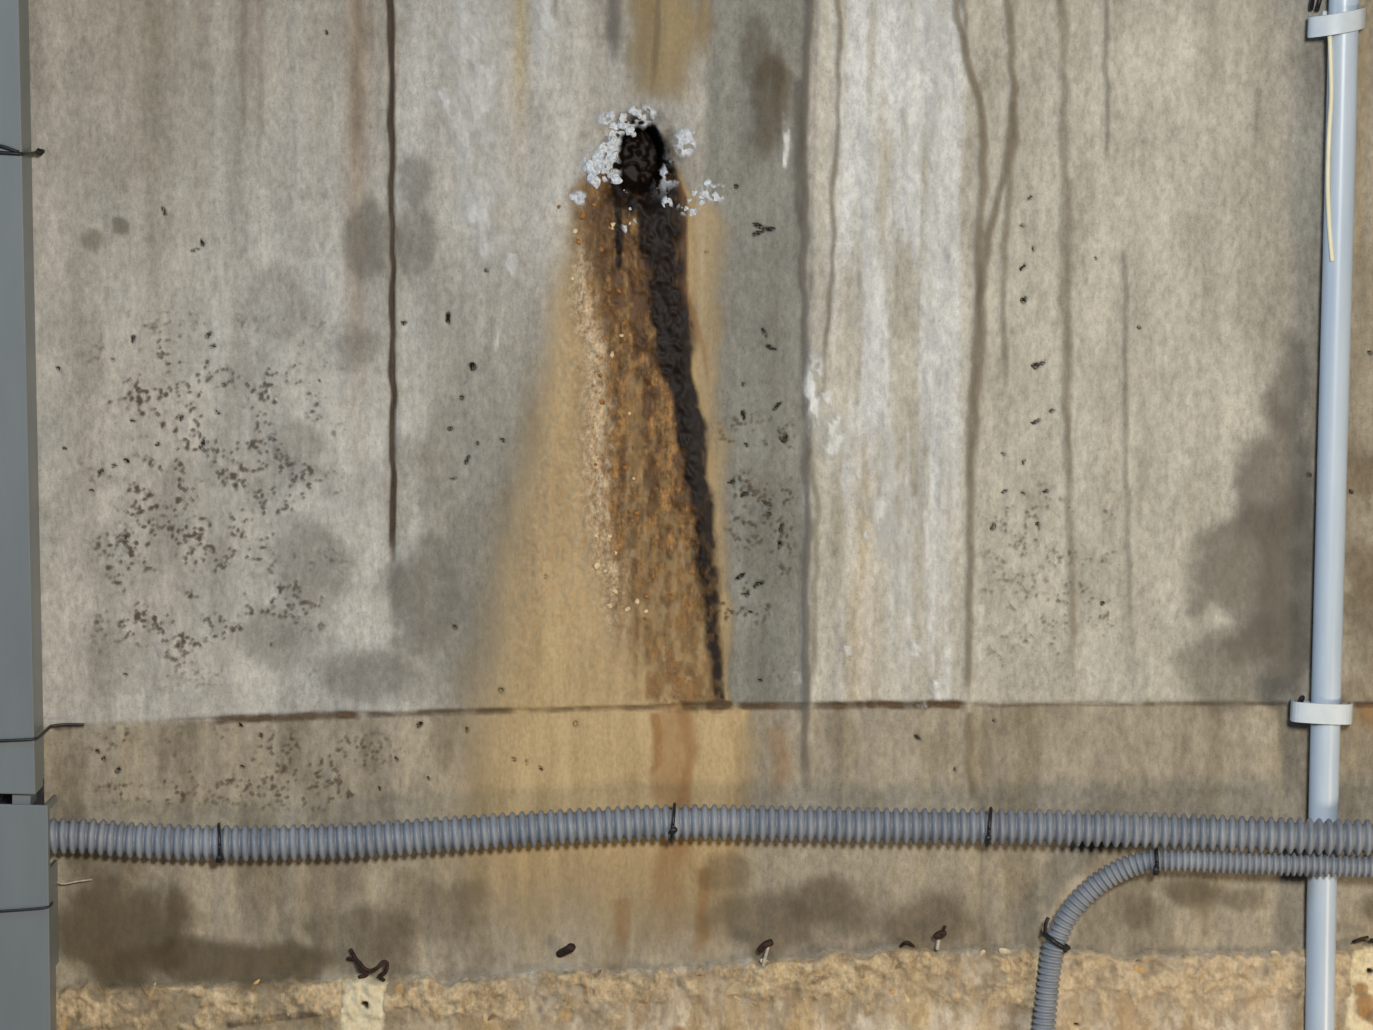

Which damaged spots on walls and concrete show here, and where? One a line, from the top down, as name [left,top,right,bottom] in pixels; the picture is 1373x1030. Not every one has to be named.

crack [387,0,397,548]
corrosion [473,115,749,819]
corrosion [483,836,739,901]